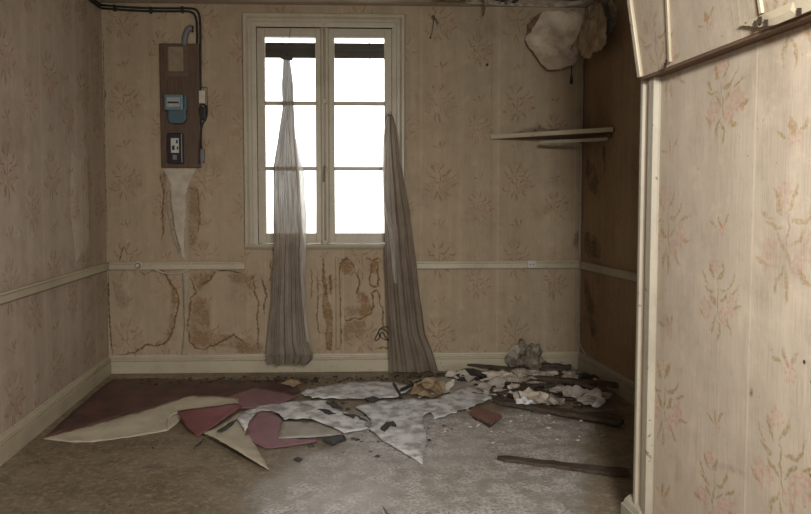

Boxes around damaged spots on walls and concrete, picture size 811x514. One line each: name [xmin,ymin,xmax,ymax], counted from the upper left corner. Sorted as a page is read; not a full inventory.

flaking render [164,169,196,259]
water stain [120,260,272,355]
water stain [339,257,385,349]